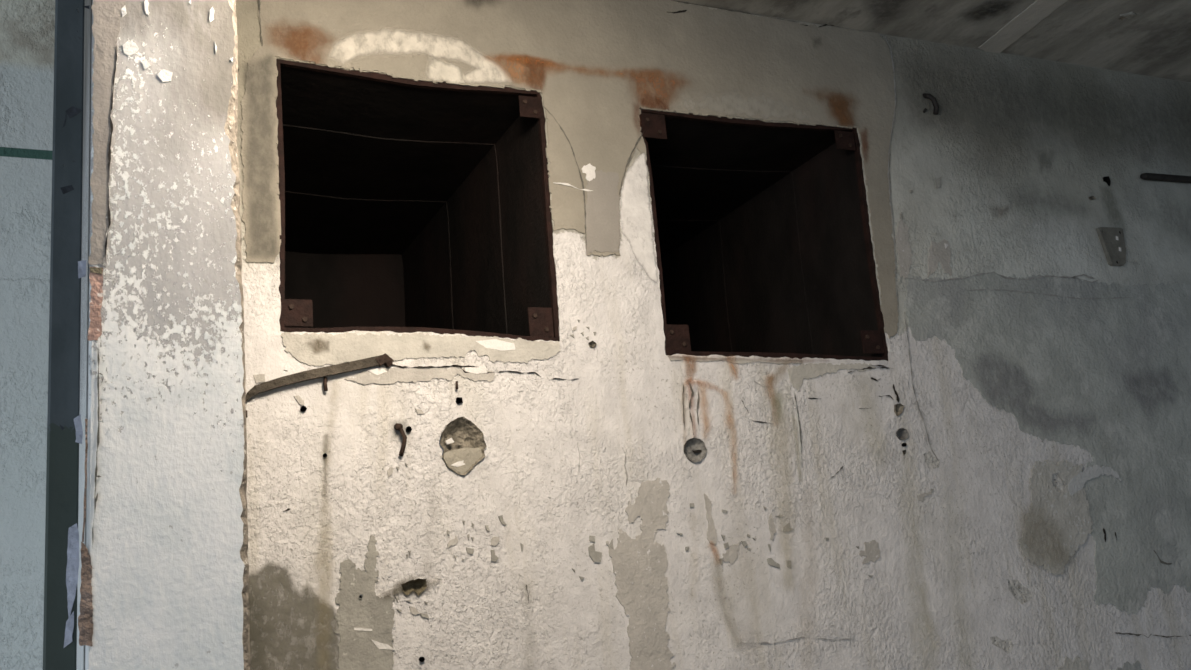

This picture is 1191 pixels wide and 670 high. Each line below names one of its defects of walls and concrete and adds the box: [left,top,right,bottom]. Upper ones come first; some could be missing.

corrosion [274,27,327,61]
corrosion [496,56,561,87]
crack [668,0,834,27]
peeling [66,0,173,341]
peeling [904,239,1191,615]
water stain [249,564,339,670]
peeling [588,478,689,670]
peeling [690,493,794,568]